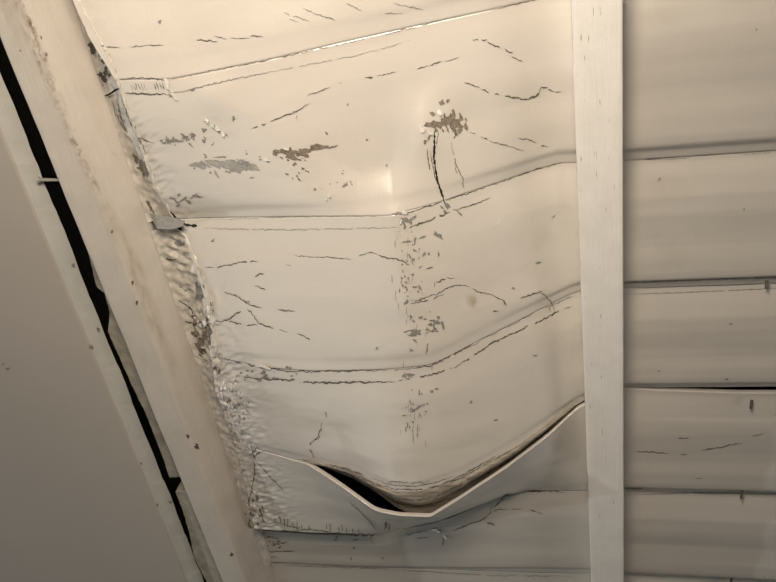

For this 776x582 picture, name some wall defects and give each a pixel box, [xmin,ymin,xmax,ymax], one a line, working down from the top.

peeling [160,117,228,147]
peeling [189,143,337,181]
crack [101,3,447,153]
peeling [420,99,468,144]
crack [466,83,558,100]
crack [178,131,570,384]
peeling [191,282,212,354]
peeling [213,364,297,435]
crack [332,443,531,507]
peeling [244,490,265,529]
crack [269,503,568,577]
crack [442,490,563,547]